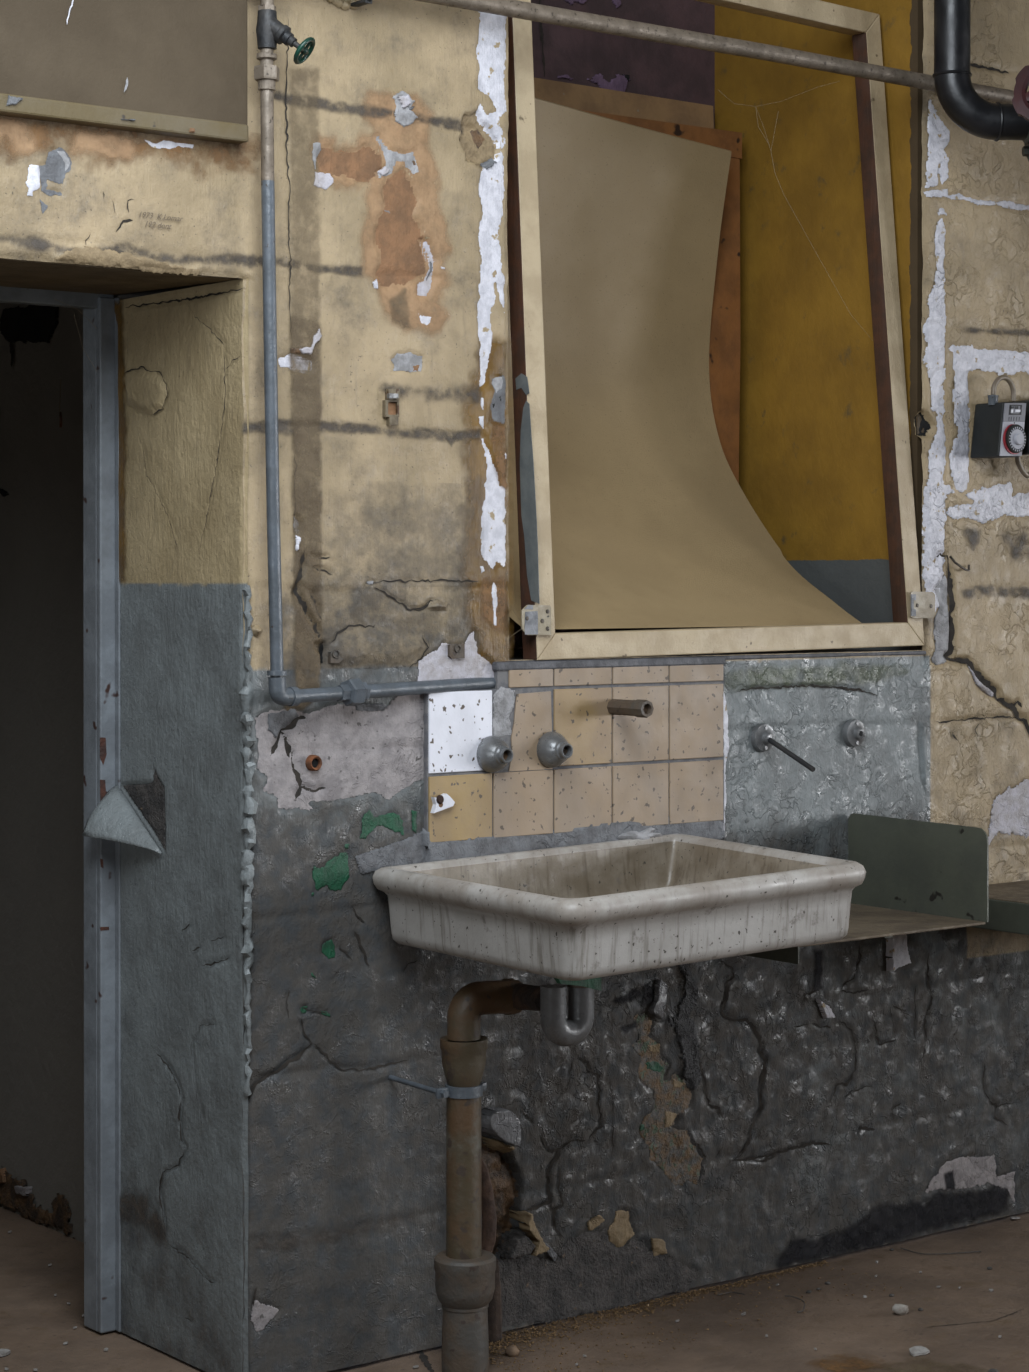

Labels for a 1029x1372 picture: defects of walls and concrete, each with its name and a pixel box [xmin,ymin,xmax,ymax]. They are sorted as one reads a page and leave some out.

flaking render [312,136,445,296]
peeling [459,12,507,625]
peeling [914,99,1029,665]
crack [292,550,332,638]
crack [365,579,478,611]
crack [936,553,1029,740]
flaking render [255,631,494,896]
crack [248,992,407,1101]
crack [697,945,933,1162]
crack [521,1057,614,1239]
flaking render [481,1107,699,1327]
flaking render [925,1154,1020,1219]